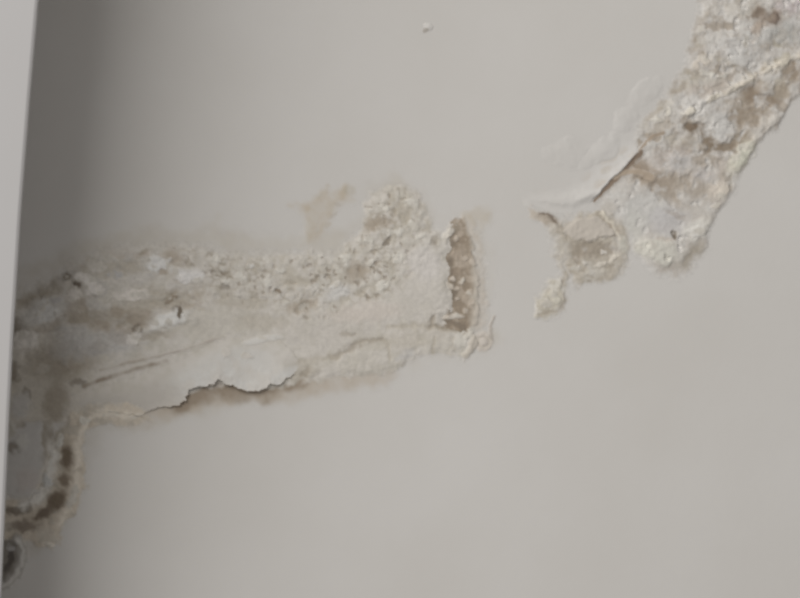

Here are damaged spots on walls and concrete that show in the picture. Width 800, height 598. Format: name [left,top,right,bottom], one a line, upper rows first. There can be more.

flaking render [526,0,800,322]
flaking render [2,182,492,593]
damp [17,166,508,534]